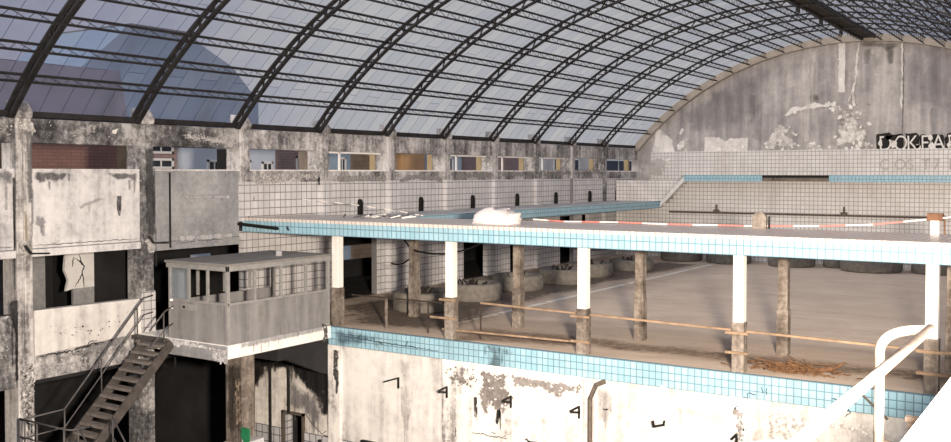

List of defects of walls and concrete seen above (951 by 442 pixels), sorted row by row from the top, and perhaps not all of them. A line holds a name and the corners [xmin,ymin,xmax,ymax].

peeling [764,43,873,150]
peeling [704,137,748,151]
leakage [590,262,690,285]
leakage [346,299,444,329]
leakage [458,291,512,325]
leakage [525,284,578,300]
leakage [242,327,323,347]
leakage [337,333,367,343]
leakage [226,366,241,439]
leakage [256,359,328,423]
peeling [445,366,582,414]
peeling [761,409,810,441]